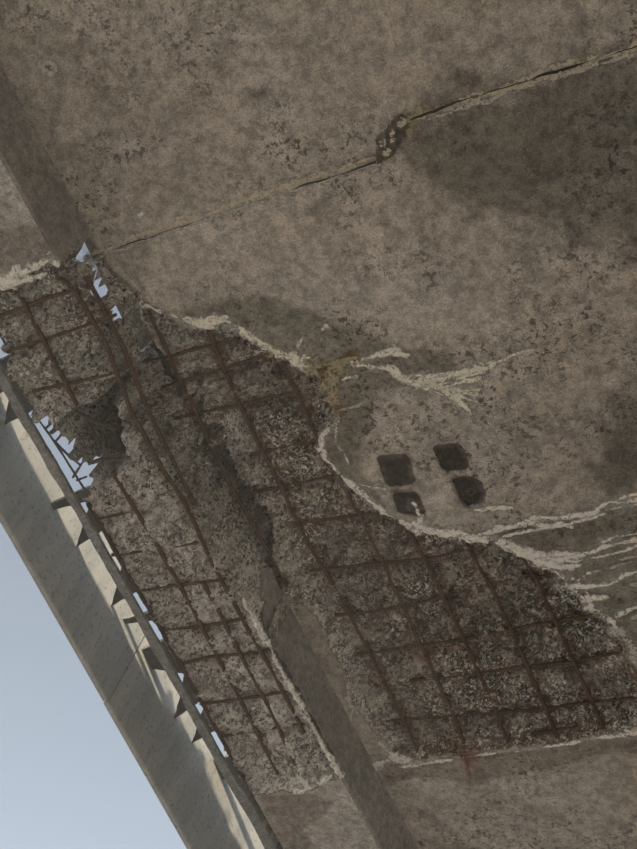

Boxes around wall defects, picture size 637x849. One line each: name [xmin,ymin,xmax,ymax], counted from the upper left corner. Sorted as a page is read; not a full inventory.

crack [410,45,637,121]
crack [88,161,376,259]
damp [0,251,60,291]
spalling [0,241,637,795]
damp [137,303,637,667]
damp [512,718,637,752]